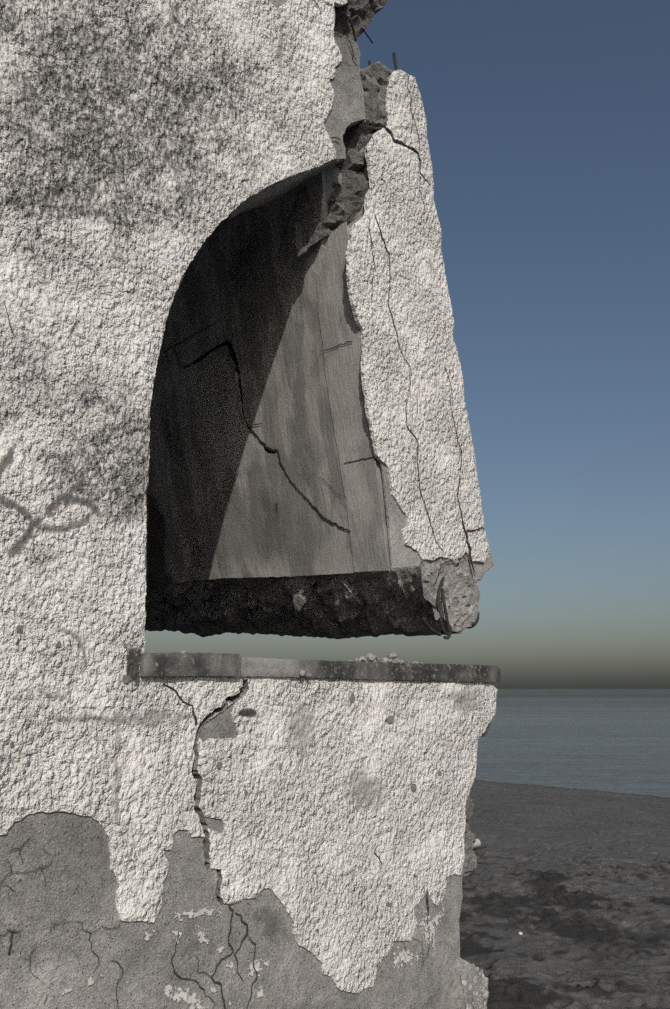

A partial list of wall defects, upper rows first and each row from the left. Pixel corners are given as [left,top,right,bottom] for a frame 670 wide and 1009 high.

spalling [290,0,392,257]
crack [359,74,429,207]
crack [163,319,351,532]
crack [367,215,484,586]
spalling [145,462,478,639]
crack [0,837,53,891]
crack [0,921,123,1009]
crack [163,679,258,1009]
peeling [0,790,487,1009]